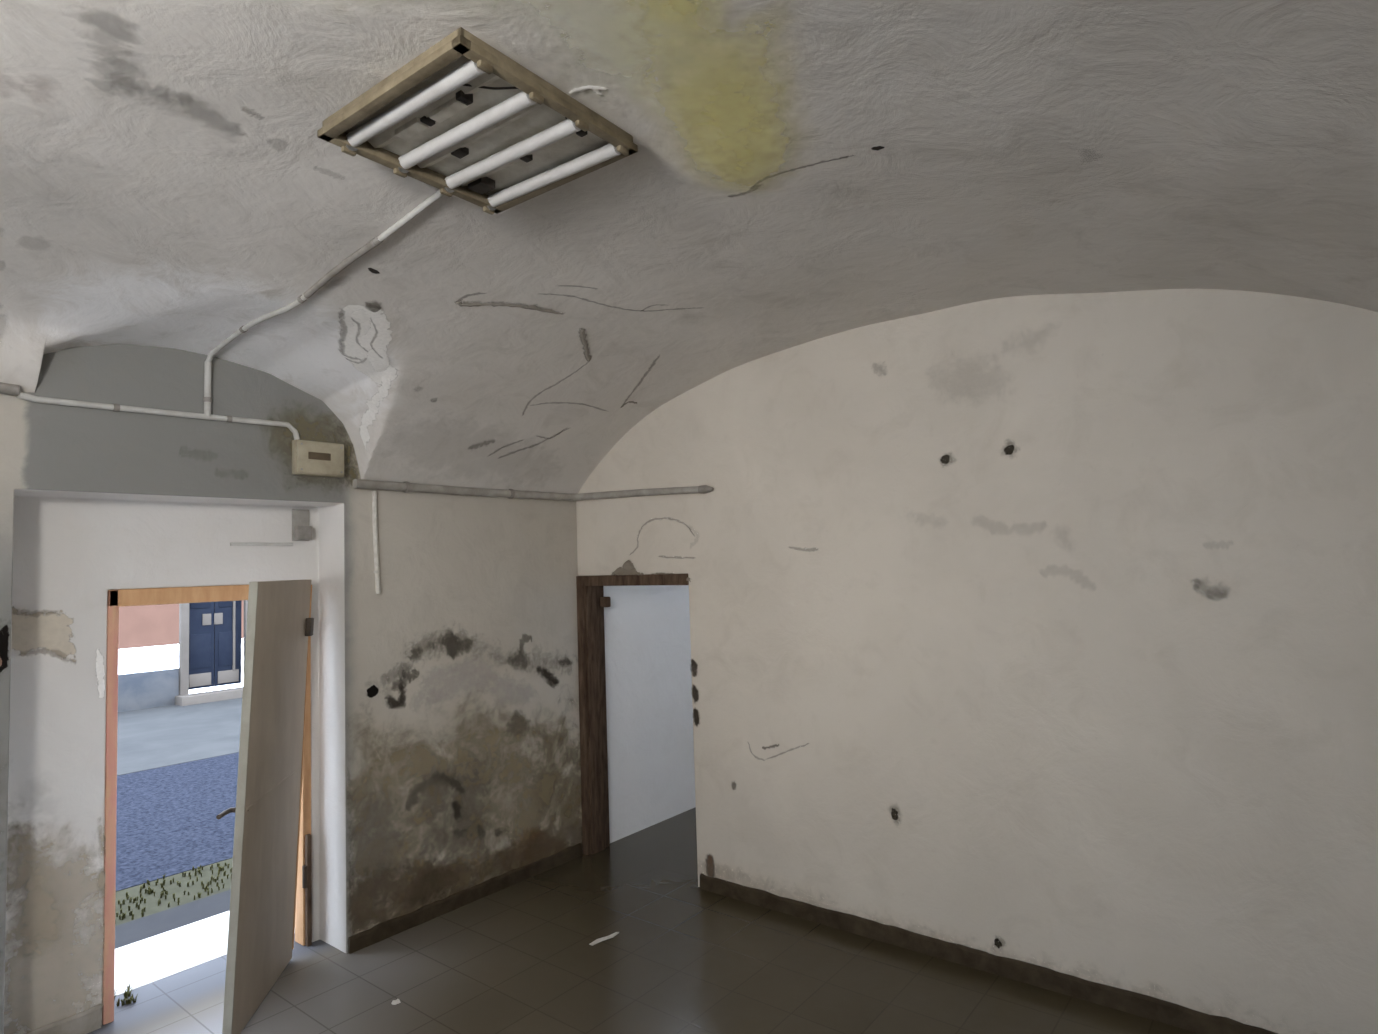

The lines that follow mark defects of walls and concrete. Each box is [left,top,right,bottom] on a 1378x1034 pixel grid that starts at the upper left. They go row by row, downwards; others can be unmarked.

leakage [642,0,777,179]
peeling [0,608,76,672]
peeling [95,648,106,698]
mould [386,632,473,708]
mould [509,635,571,687]
leakage [350,709,583,930]
leakage [4,836,105,1034]